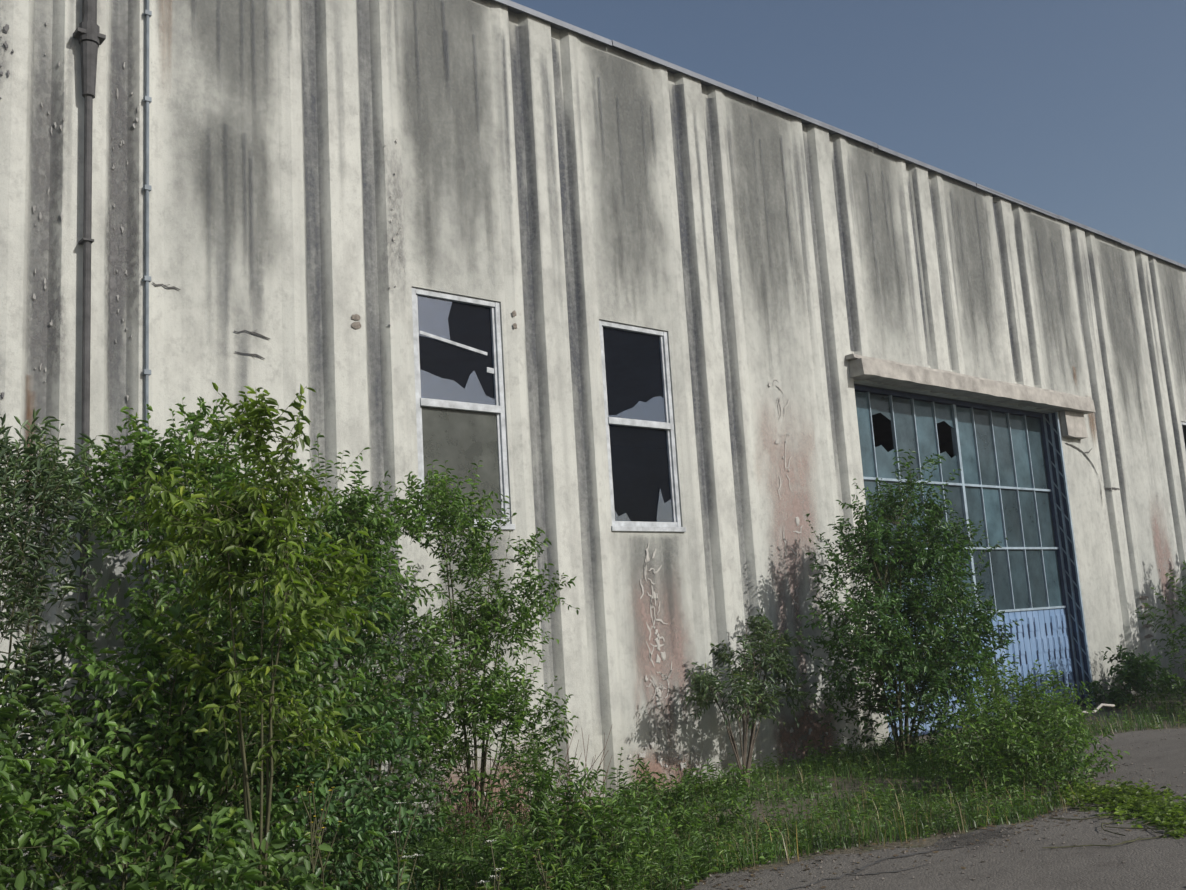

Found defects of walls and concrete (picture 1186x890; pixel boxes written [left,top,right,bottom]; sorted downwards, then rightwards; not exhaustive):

water stain [198,130,245,211]
crack [234,330,270,359]
water stain [670,84,711,550]
water stain [706,98,744,554]
water stain [735,107,797,296]
water stain [808,171,816,257]
water stain [820,301,836,433]
water stain [832,144,856,352]
water stain [908,177,936,338]
water stain [936,247,949,340]
water stain [952,190,1031,371]
water stain [1033,215,1186,505]